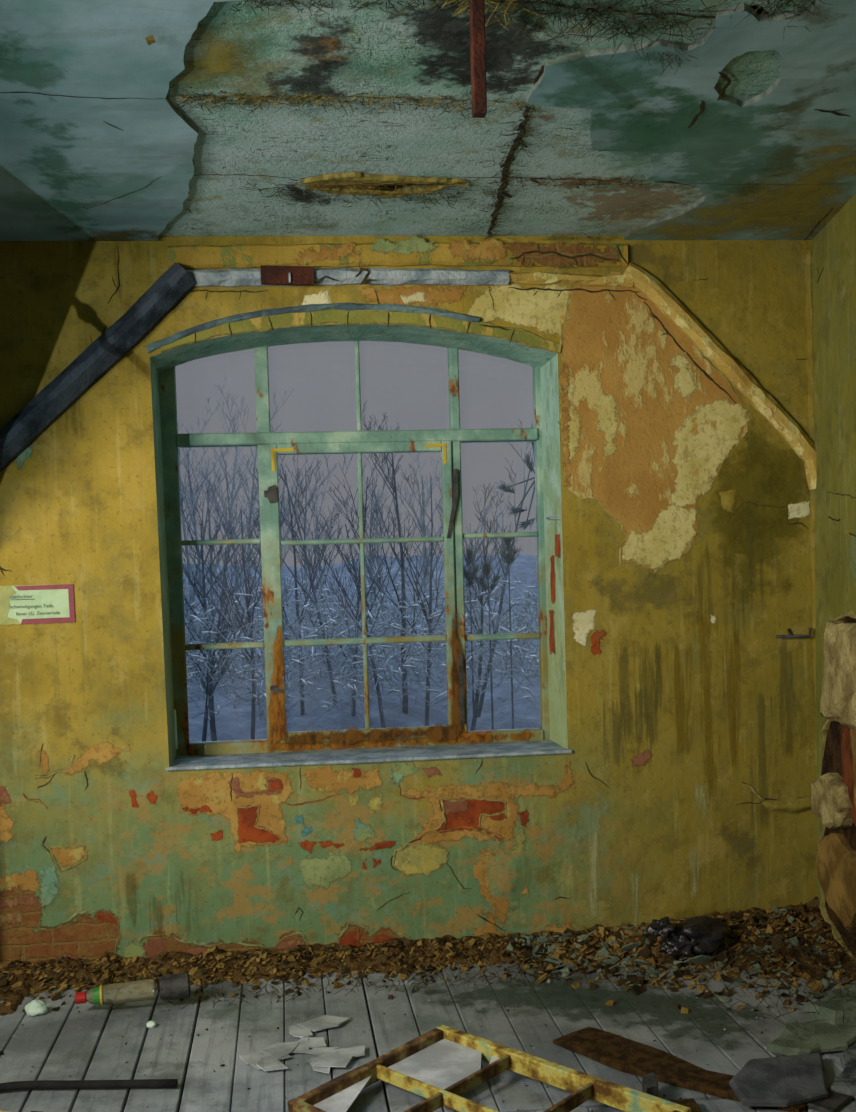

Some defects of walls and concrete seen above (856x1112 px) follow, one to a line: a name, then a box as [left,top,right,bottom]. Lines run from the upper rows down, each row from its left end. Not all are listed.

damp [388,0,471,86]
damp [485,1,567,94]
crack [688,72,731,128]
crack [1,58,648,236]
crack [315,262,380,304]
crack [481,245,738,404]
peeling [160,235,749,573]
spalling [834,610,856,623]
corrosion [268,612,532,752]
peeling [64,742,131,776]
spalling [820,720,844,777]
flaking render [0,759,856,1012]